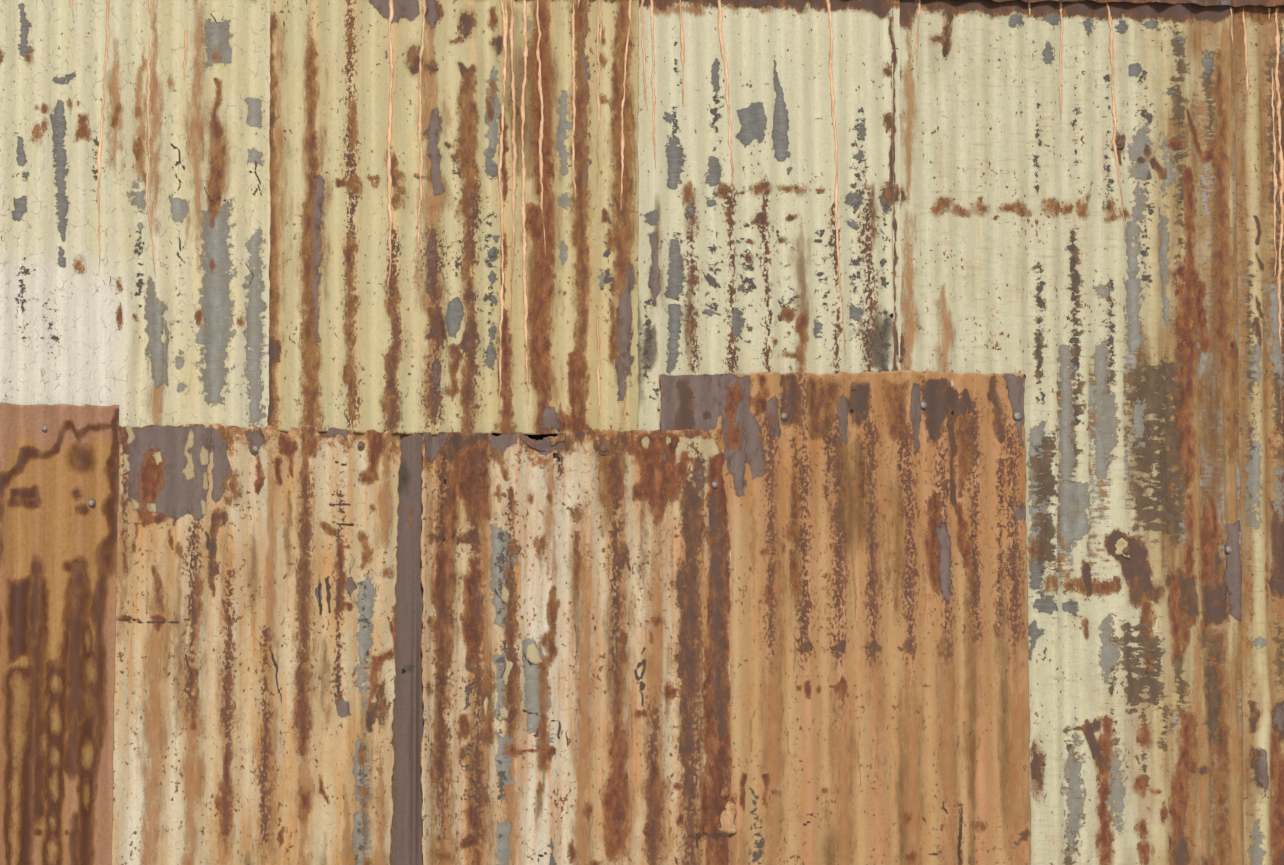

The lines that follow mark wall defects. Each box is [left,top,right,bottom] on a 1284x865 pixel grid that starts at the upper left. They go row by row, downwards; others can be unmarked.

peeling [18,3,33,57]
peeling [202,18,233,71]
peeling [11,195,33,233]
peeling [15,257,60,354]
peeling [50,71,76,268]
peeling [126,157,149,333]
peeling [169,194,268,456]
peeling [598,58,893,504]
peeling [123,425,232,526]
peeling [462,512,556,800]
peeling [1061,713,1087,865]
peeling [1096,613,1230,837]